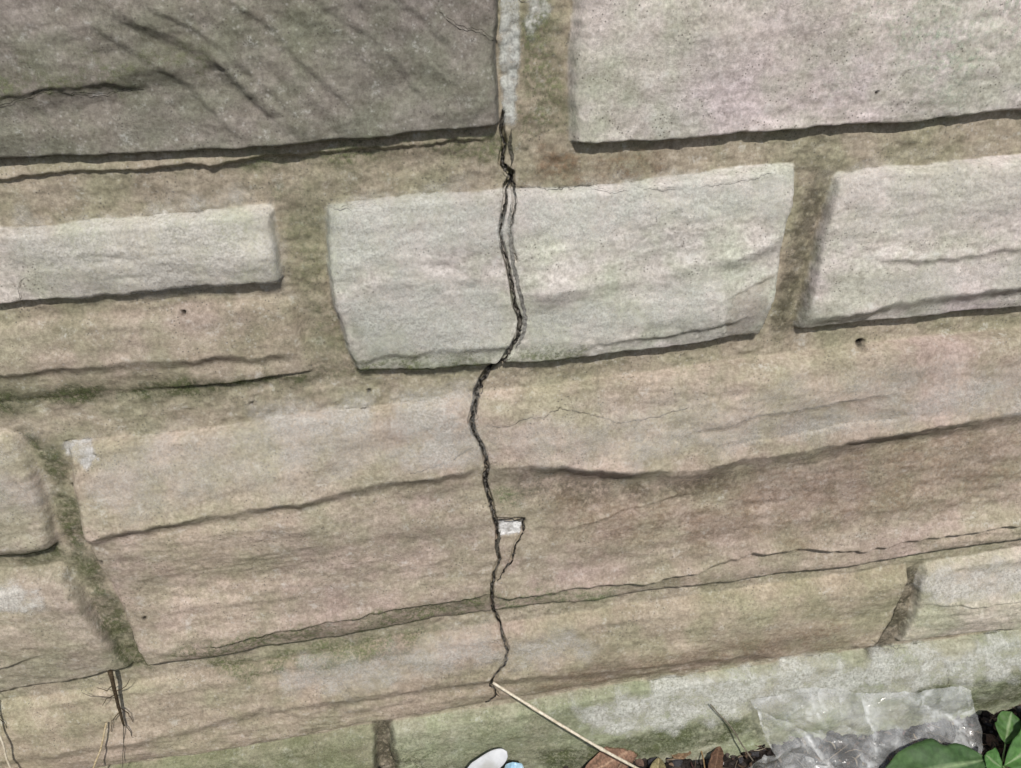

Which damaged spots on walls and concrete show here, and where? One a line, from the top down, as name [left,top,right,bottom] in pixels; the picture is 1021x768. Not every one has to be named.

crack [410,112,771,703]
damp [581,631,1021,734]
damp [374,720,398,768]